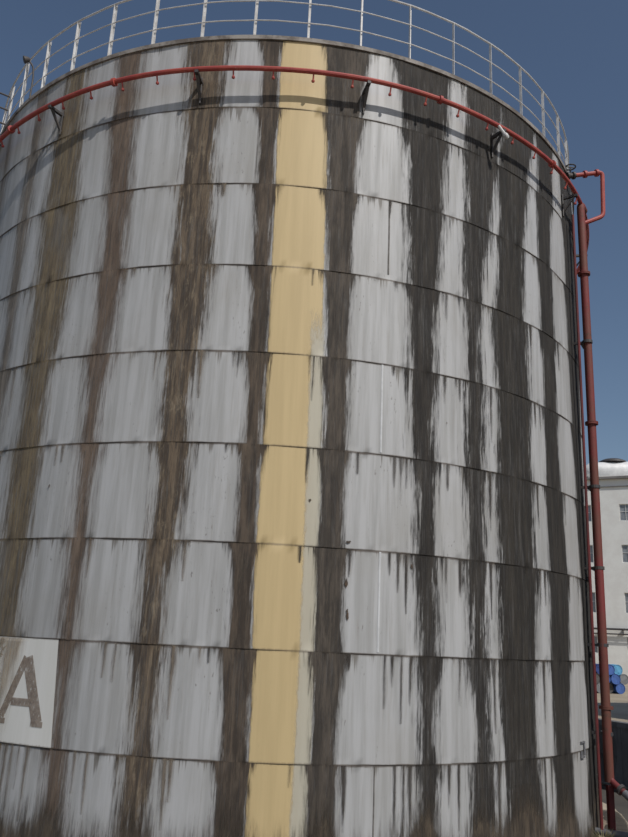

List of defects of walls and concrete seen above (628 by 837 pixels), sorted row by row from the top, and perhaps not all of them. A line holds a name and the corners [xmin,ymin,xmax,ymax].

leakage [0,743,30,799]
leakage [0,68,90,696]
leakage [41,51,142,822]
leakage [113,40,232,836]
leakage [199,40,285,837]
leakage [298,45,370,837]
leakage [384,57,604,837]